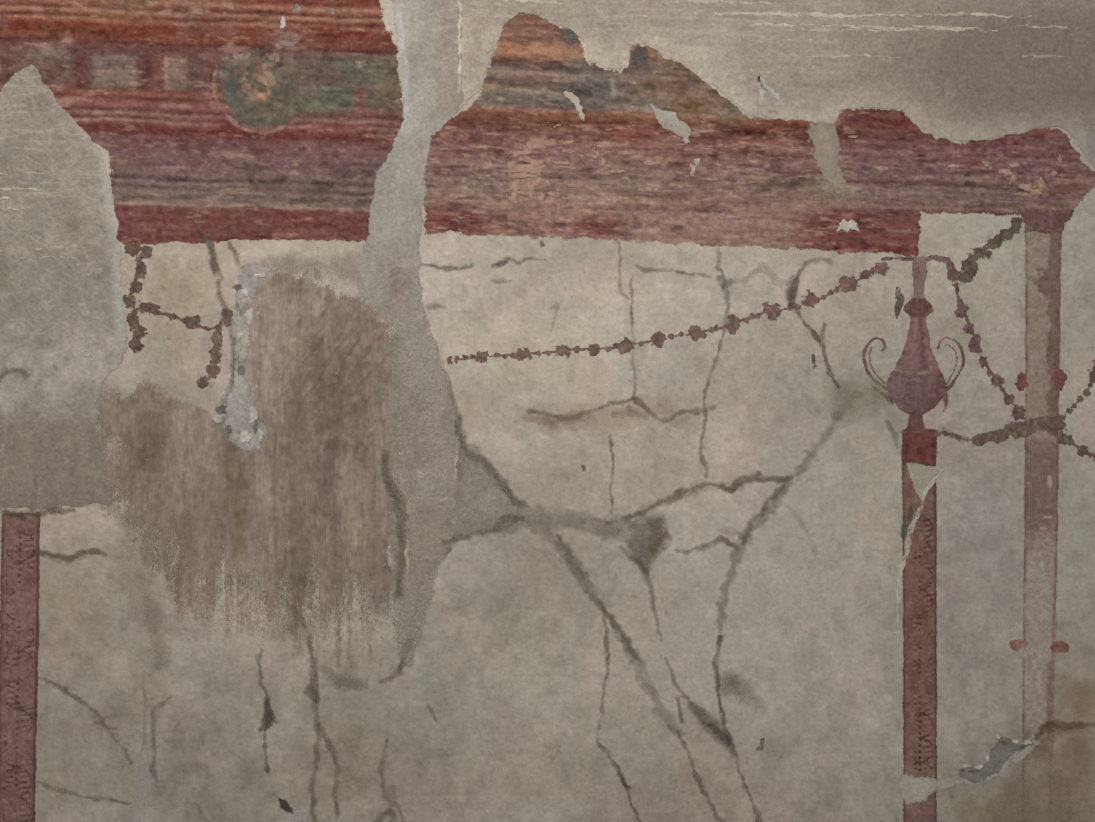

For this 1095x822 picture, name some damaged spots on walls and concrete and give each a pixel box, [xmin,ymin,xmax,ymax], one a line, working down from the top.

peeling [507,122,583,205]
peeling [563,91,585,122]
peeling [650,104,691,144]
peeling [807,122,861,195]
crack [34,548,102,561]
crack [382,455,403,595]
crack [435,260,839,748]
peeling [895,459,943,637]
crack [258,653,274,772]
crack [306,641,339,822]
crack [597,740,640,821]
spalling [958,737,1034,783]